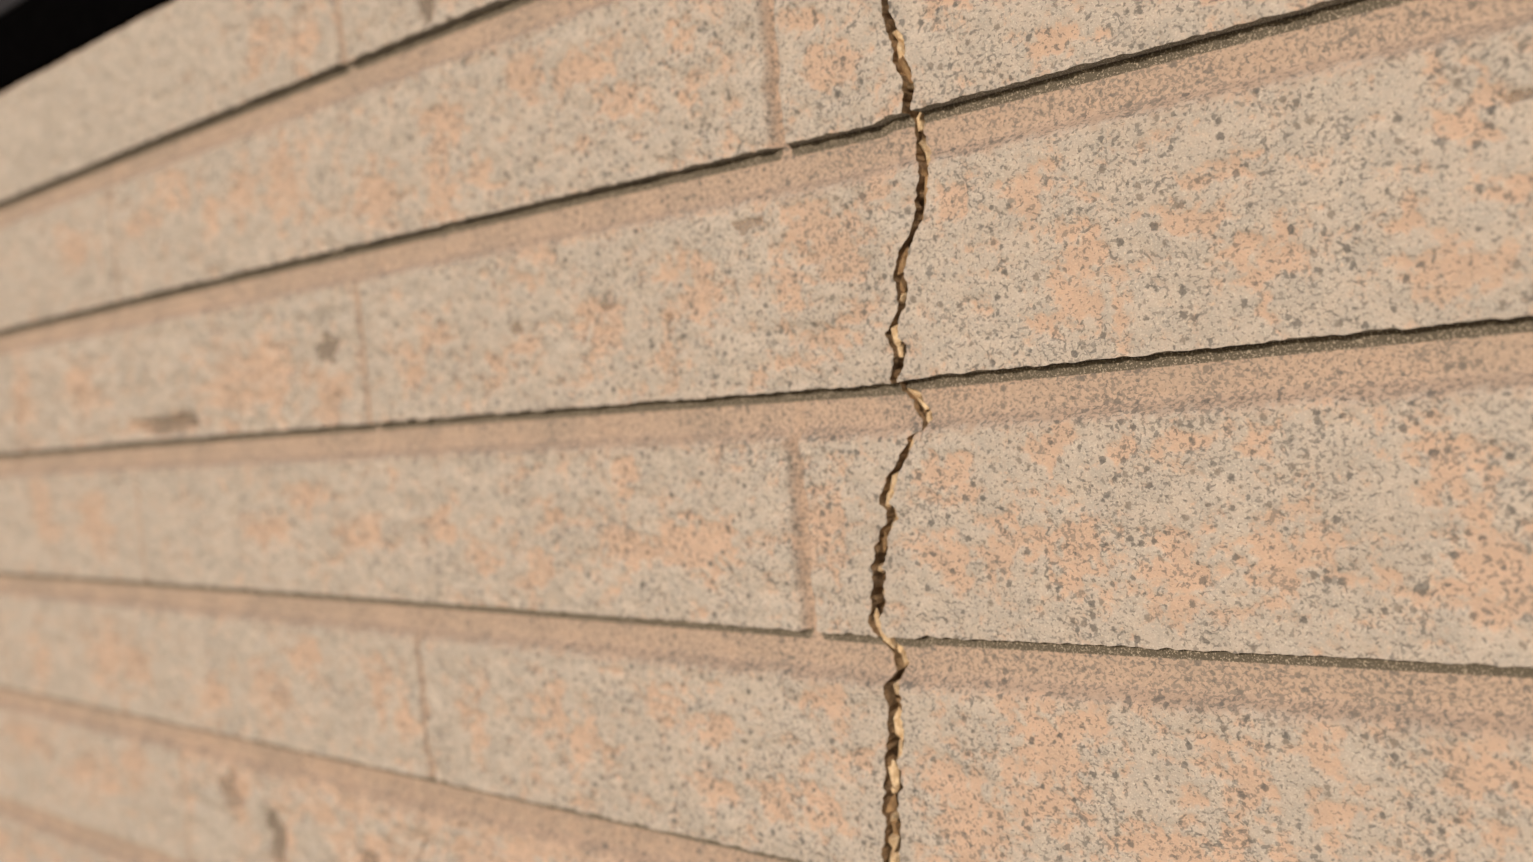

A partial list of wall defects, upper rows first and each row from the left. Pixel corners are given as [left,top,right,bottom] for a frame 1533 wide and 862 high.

crack [868,0,933,862]